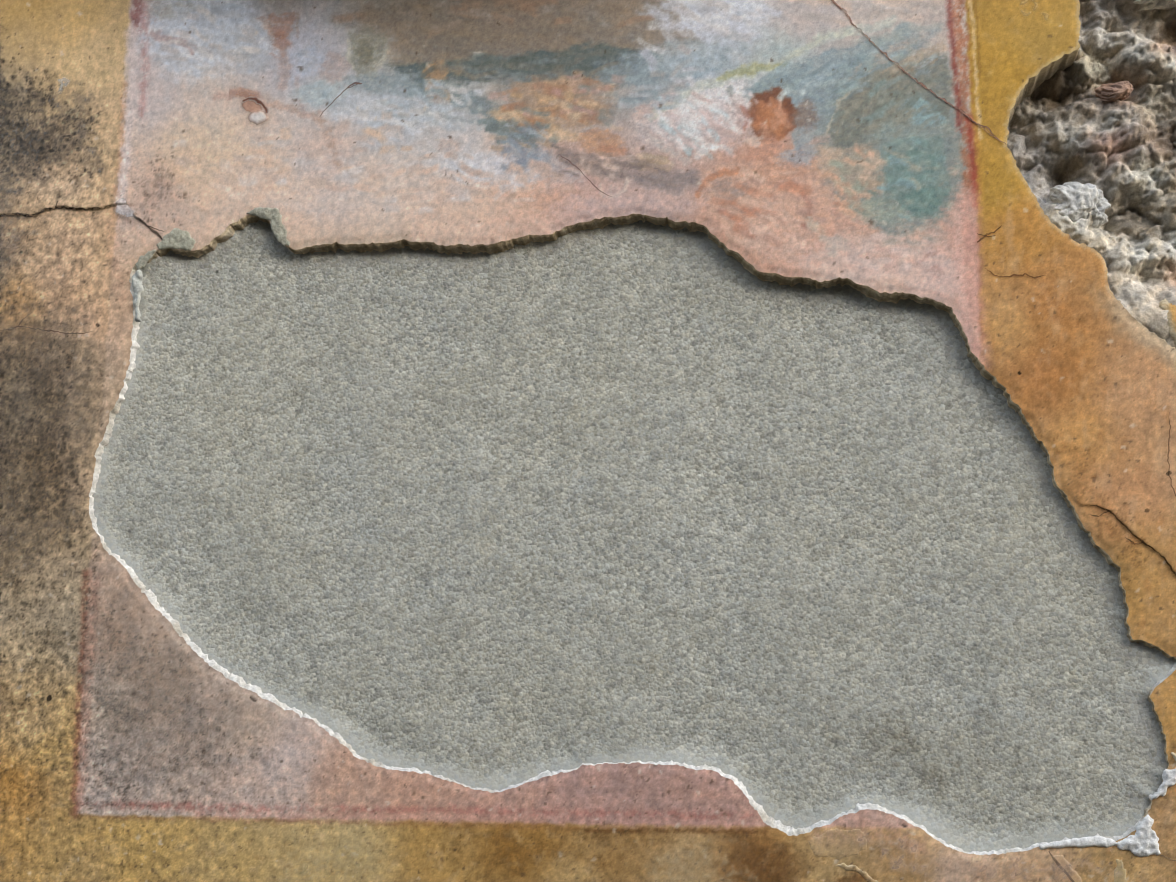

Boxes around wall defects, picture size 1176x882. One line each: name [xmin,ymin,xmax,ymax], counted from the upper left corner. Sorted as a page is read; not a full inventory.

leakage [0,47,104,200]
crack [831,0,1006,144]
crack [0,201,164,240]
leakage [0,298,181,697]
spalling [89,207,1176,882]
crack [1082,505,1176,576]
crack [1167,412,1176,496]
leakage [84,672,229,801]